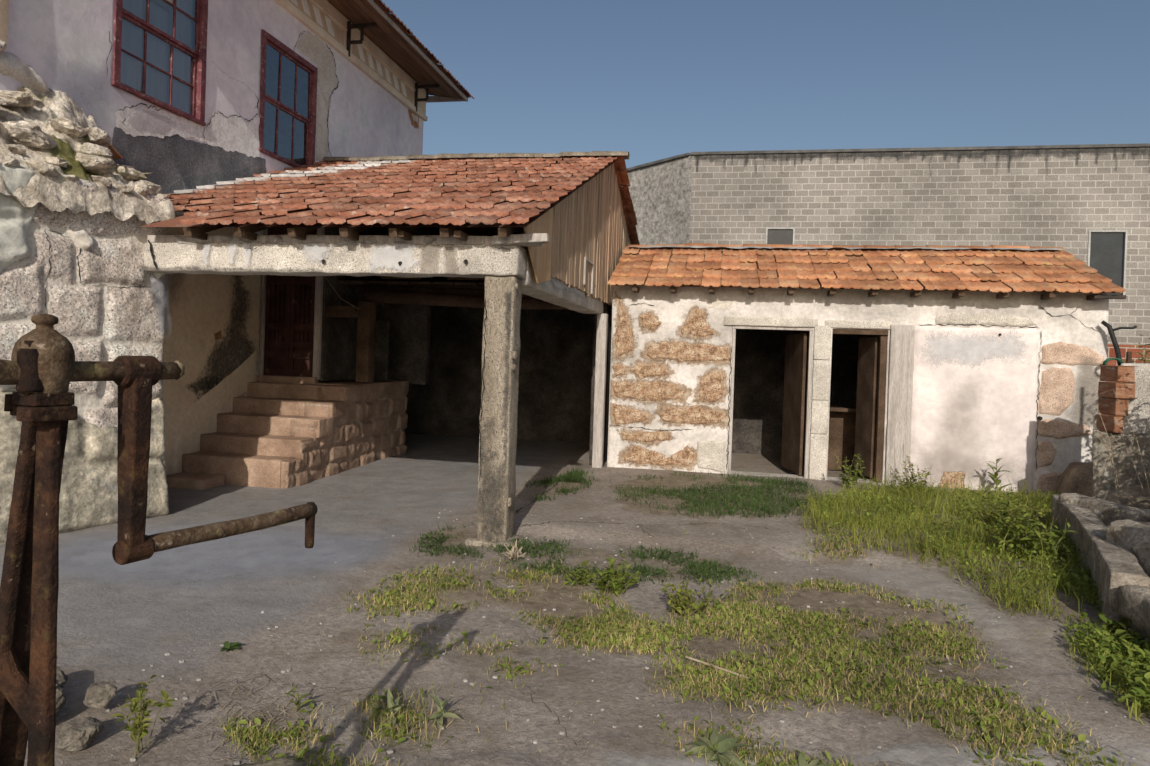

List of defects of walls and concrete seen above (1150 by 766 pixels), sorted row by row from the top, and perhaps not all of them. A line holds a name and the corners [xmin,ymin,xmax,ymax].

flaking render [112,102,266,198]
spalling [294,31,339,162]